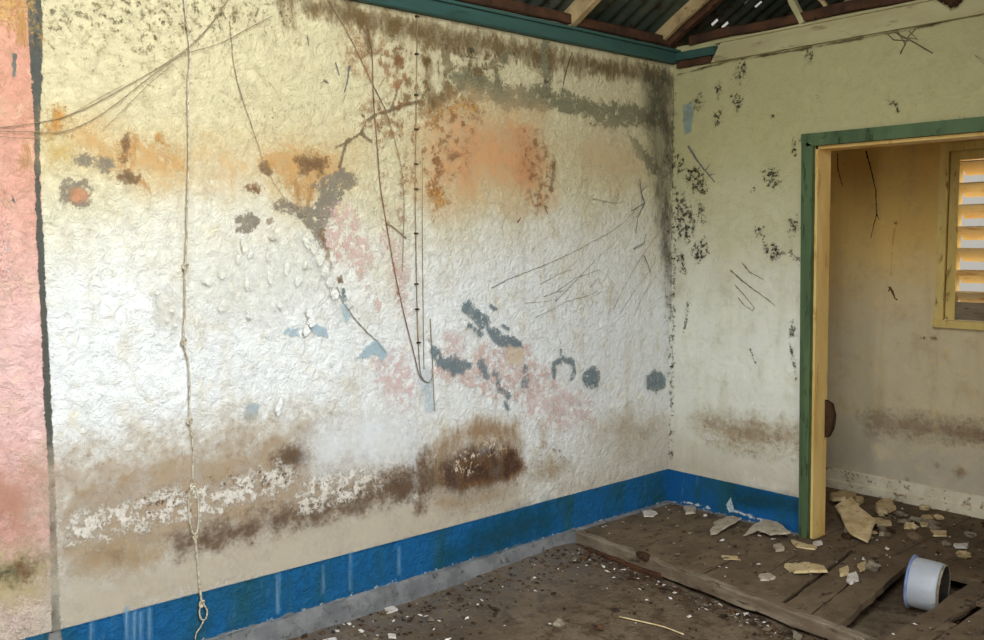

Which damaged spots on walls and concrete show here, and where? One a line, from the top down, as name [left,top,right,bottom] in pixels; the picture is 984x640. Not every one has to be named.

leakage [715,62,747,111]
peeling [59,177,93,209]
leakage [32,0,710,435]
leakage [750,168,782,193]
peeling [234,167,382,324]
leakage [755,225,800,262]
peeling [26,0,62,640]
peeling [283,307,329,338]
peeling [428,298,600,426]
peeling [646,369,666,394]
leakage [876,414,984,442]
leakage [0,414,526,625]